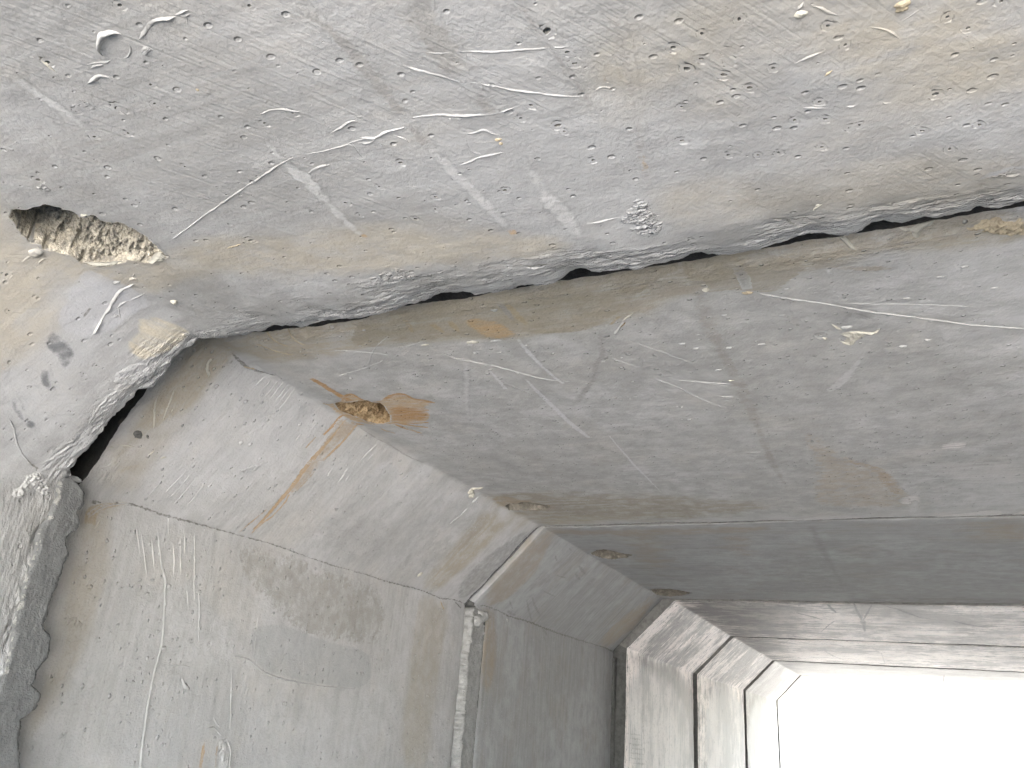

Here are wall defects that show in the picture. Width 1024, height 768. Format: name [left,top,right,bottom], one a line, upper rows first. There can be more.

spalling [5,184,169,335]
crack [518,263,554,271]
crack [759,293,1024,329]
spalling [88,363,158,424]
peeling [133,391,174,439]
spalling [310,378,435,437]
crack [336,337,568,382]
crack [610,340,734,408]
spalling [10,420,82,498]
rust [238,418,359,534]
spalling [450,496,557,524]
crack [90,500,613,768]